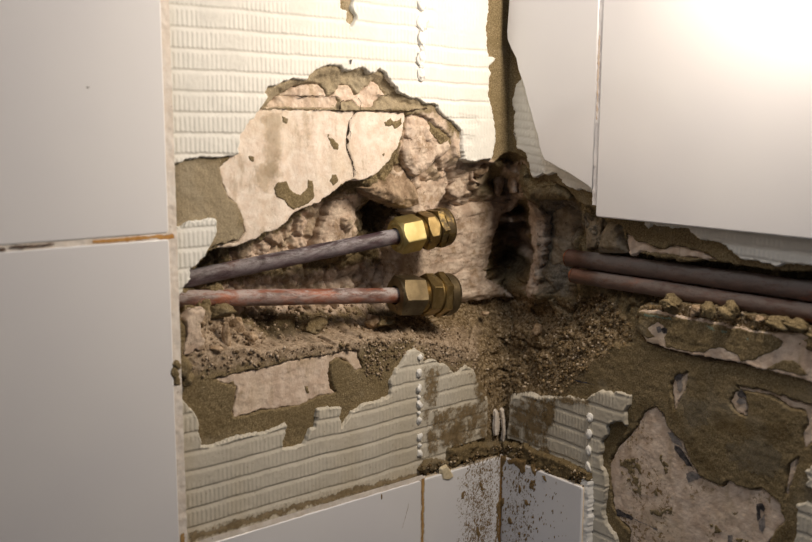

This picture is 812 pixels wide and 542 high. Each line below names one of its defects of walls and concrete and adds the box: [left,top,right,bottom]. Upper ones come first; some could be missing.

spalling [213,82,404,249]
crack [262,94,427,180]
spalling [627,235,716,260]
spalling [180,306,205,355]
spalling [216,350,362,417]
spalling [673,373,688,409]
spalling [731,386,812,447]
spalling [611,407,786,542]
spalling [787,458,799,494]